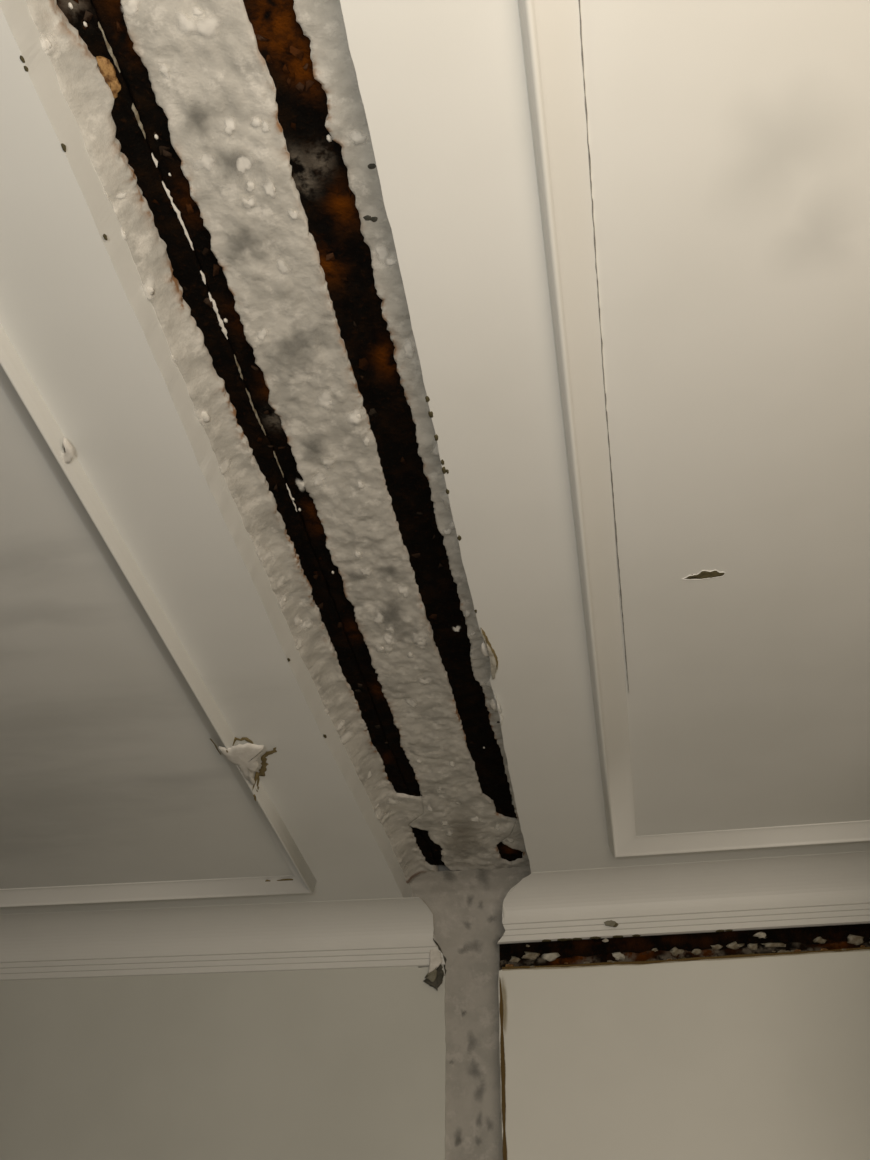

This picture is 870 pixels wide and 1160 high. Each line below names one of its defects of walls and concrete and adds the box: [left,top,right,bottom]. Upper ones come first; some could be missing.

corrosion [96,56,121,99]
flaking render [26,0,531,1160]
peeling [682,570,725,580]